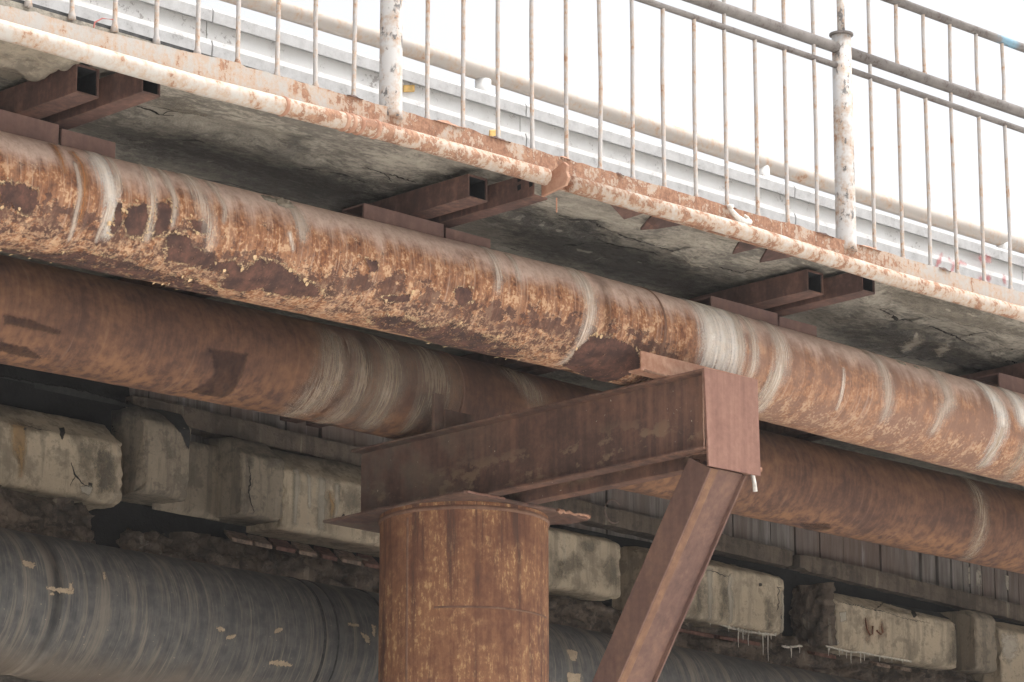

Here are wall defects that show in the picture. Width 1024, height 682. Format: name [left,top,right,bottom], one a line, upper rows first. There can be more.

leakage [88,151,121,236]
leakage [130,132,369,249]
rust [0,144,326,300]
rust [365,257,381,274]
rust [453,284,474,307]
rust [0,343,40,358]
rust [191,350,246,397]
rust [362,290,524,361]
rust [563,332,641,383]
crack [247,466,255,513]
spalling [789,582,847,647]
efflorescence [825,645,912,664]